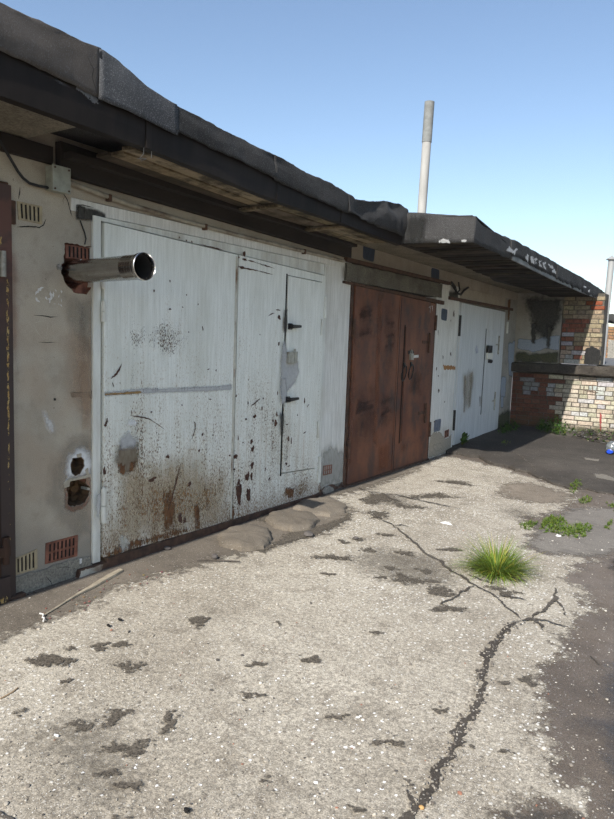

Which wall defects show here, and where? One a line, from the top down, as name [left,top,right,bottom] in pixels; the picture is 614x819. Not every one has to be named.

spalling [56,244,90,270]
spalling [36,283,88,307]
spalling [63,453,91,512]
corrosion [108,425,222,556]
corrosion [284,474,321,498]
crack [357,487,567,819]
crack [0,811,13,819]